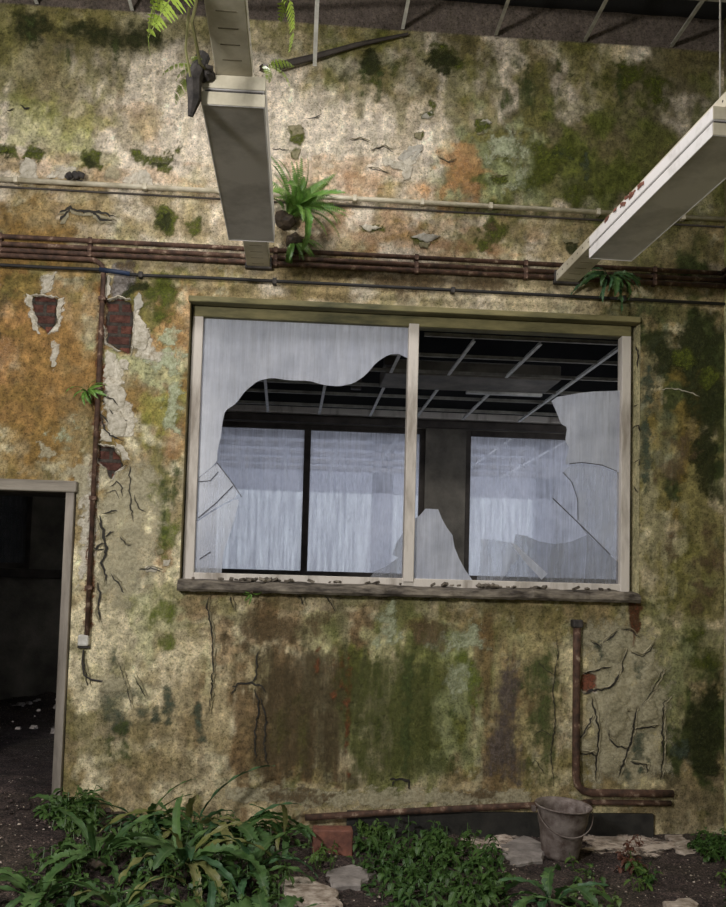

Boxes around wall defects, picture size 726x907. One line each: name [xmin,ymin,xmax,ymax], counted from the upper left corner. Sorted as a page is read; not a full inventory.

crack [58,205,116,224]
spalling [25,272,65,367]
peeling [39,442,56,458]
crack [100,396,127,441]
peeling [68,275,173,610]
crack [93,467,163,623]
crack [206,596,268,764]
water stain [225,609,531,810]
crack [532,631,559,785]
crack [580,627,672,780]
corrosion [629,603,643,641]